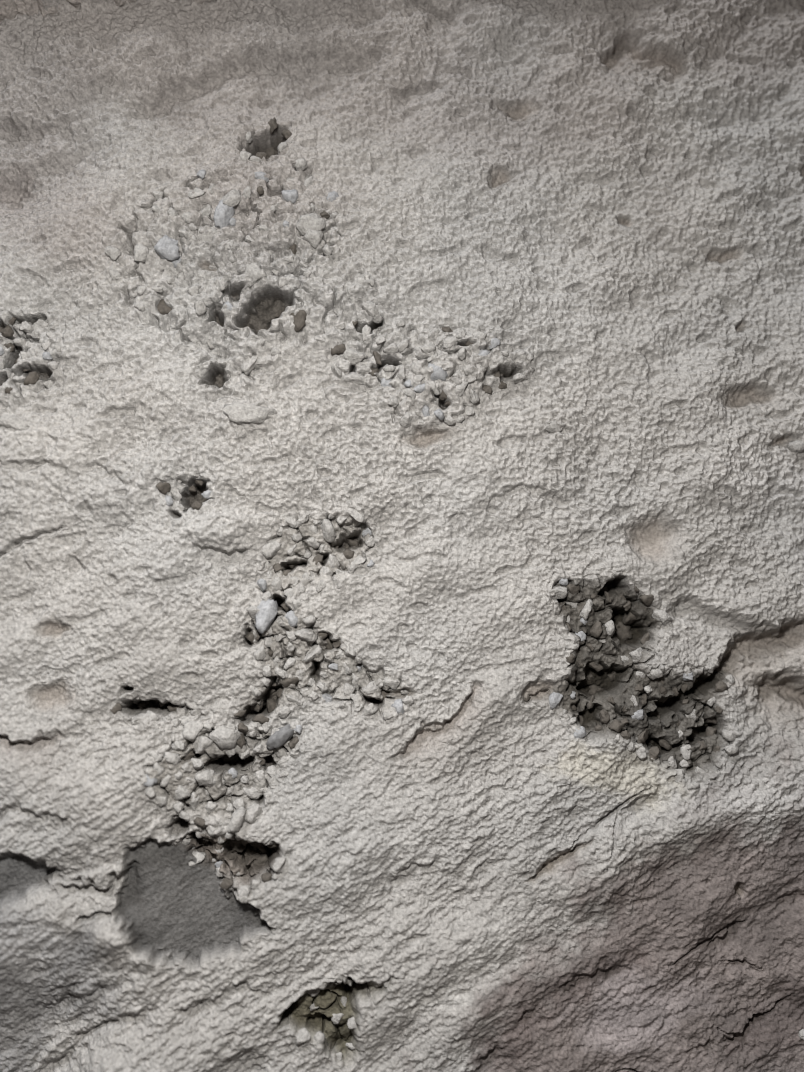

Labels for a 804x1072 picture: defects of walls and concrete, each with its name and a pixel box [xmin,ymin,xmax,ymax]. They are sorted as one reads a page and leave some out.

spalling [600,35,686,84]
spalling [205,280,298,338]
spalling [0,341,55,387]
spalling [197,360,234,394]
spalling [117,699,184,722]
spalling [361,689,401,711]
spalling [573,660,633,739]
spalling [644,671,732,759]
spalling [177,746,278,777]
peeling [109,832,287,975]
spalling [332,976,364,1009]
spalling [273,1000,299,1032]